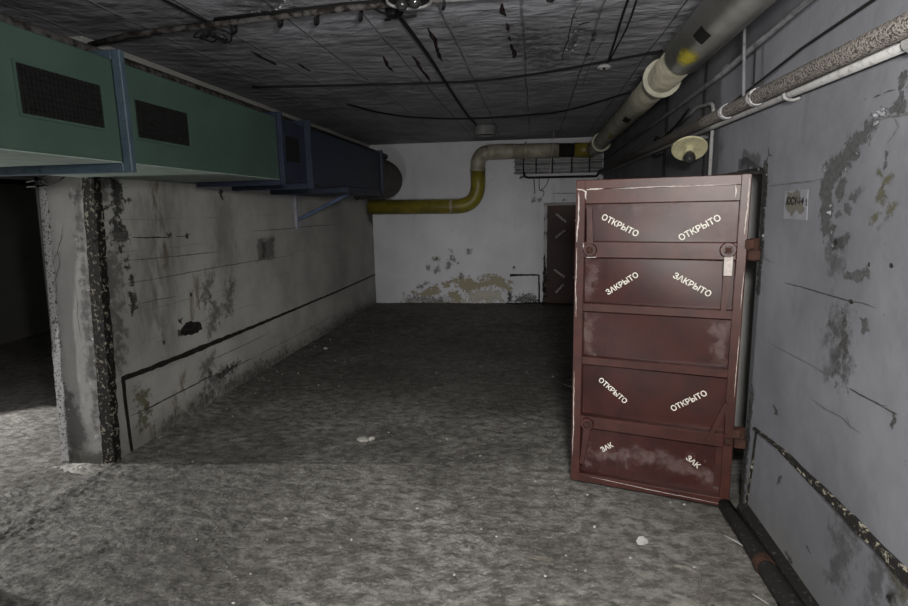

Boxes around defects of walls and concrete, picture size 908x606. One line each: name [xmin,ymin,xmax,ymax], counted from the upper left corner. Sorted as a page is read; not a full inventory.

peeling [818,70,907,250]
peeling [400,273,514,303]
peeling [843,263,870,283]